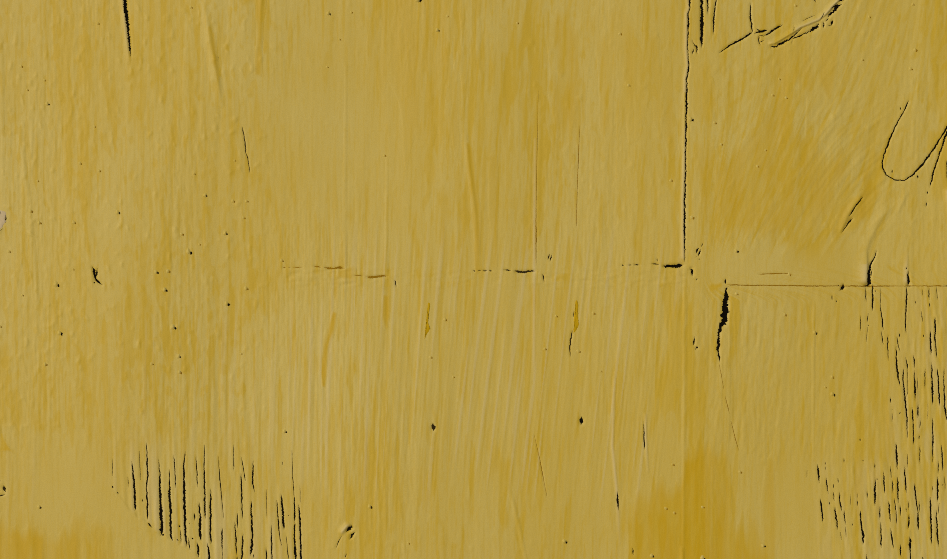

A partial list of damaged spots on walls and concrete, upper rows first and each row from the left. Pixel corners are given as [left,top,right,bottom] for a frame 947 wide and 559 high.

crack [118,0,132,65]
crack [622,0,782,268]
crack [112,445,302,559]
crack [716,247,947,559]